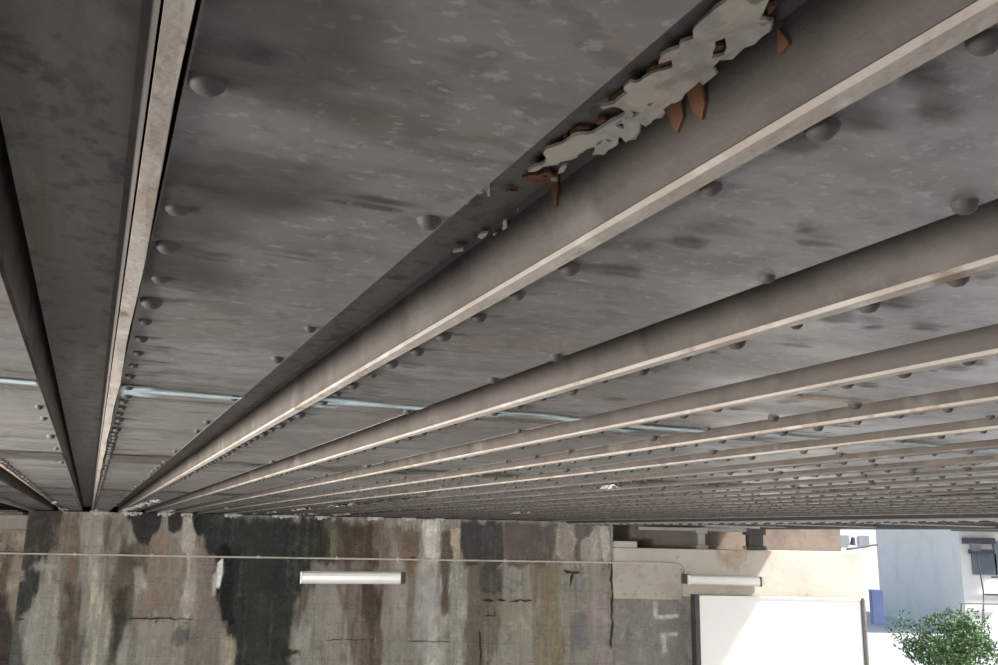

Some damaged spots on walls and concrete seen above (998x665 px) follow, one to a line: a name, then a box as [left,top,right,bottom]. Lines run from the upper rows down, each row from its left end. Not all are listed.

peeling [528,0,774,181]
peeling [478,219,508,239]
leakage [0,511,344,665]
leakage [395,518,557,665]
leakage [575,525,592,566]